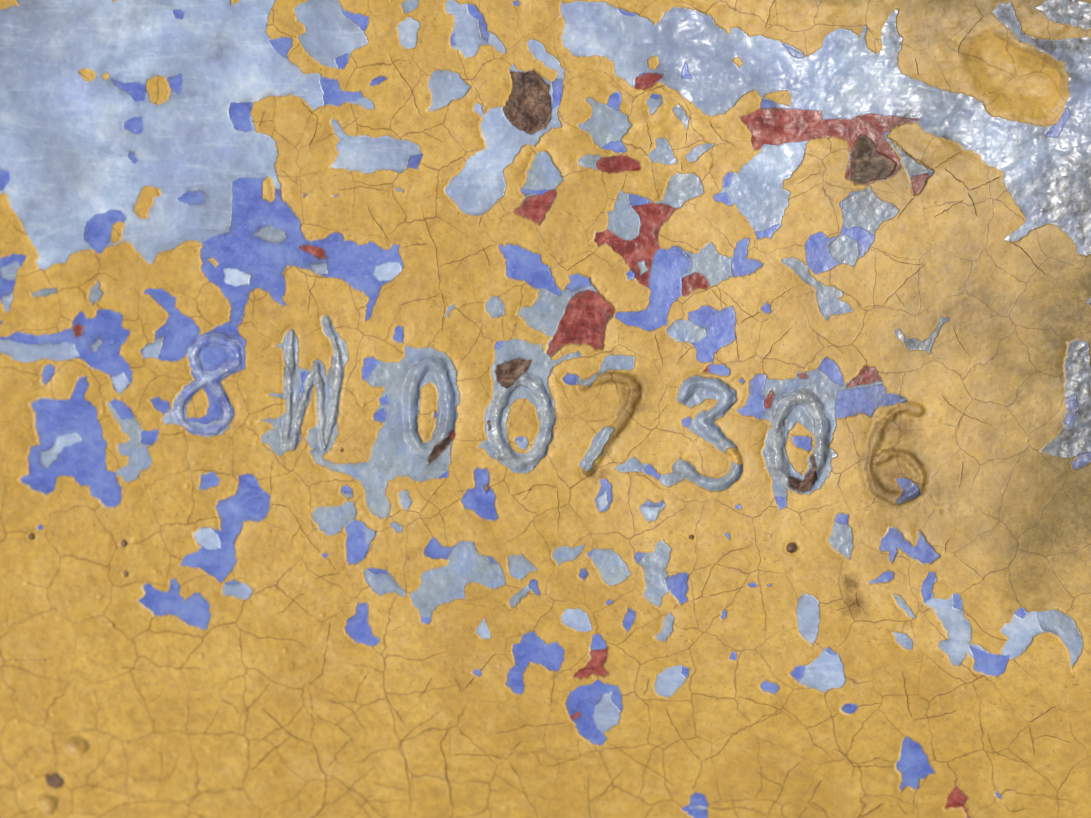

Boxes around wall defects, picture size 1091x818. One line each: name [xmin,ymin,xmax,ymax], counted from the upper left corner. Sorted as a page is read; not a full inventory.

crack [889,138,999,218]
peeling [0,0,403,507]
crack [342,186,496,330]
peeling [445,0,1091,523]
crack [713,287,839,362]
crack [867,247,923,307]
peeling [180,473,270,600]
peeling [260,320,539,624]
crack [674,544,752,609]
peeling [869,528,1083,677]
crack [82,622,880,818]
peeling [561,608,622,745]